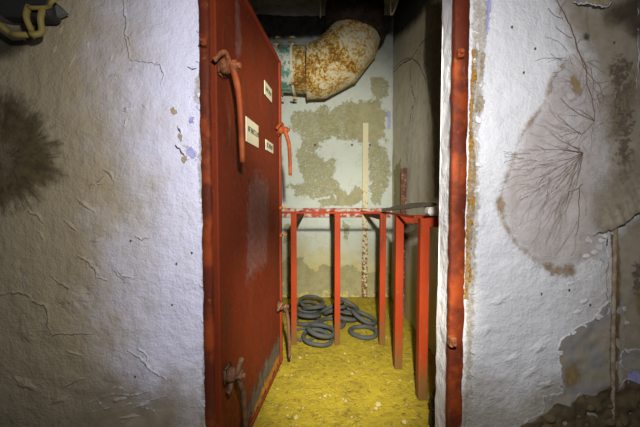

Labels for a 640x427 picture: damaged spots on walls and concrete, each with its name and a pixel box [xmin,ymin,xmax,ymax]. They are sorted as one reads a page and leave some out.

leakage [0,96,59,216]
crack [123,0,166,86]
peeling [286,77,392,208]
rust [464,49,478,299]
crack [573,0,613,10]
leakage [564,0,640,196]
leakage [545,265,575,276]
peeling [514,301,640,427]